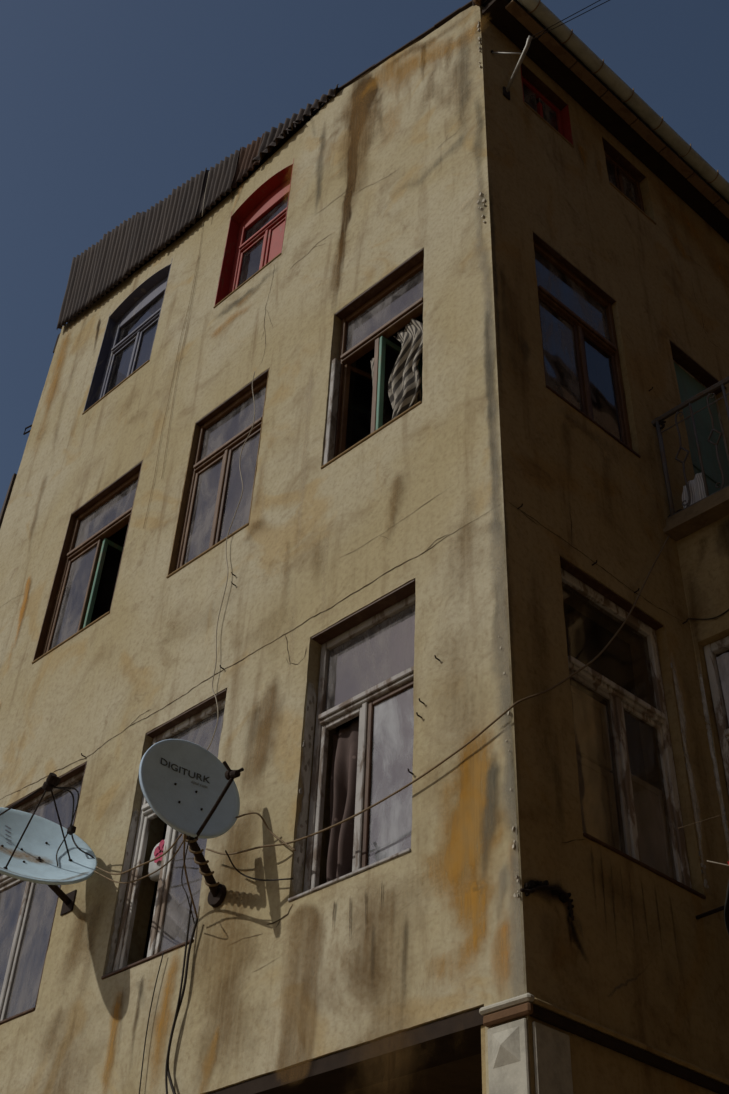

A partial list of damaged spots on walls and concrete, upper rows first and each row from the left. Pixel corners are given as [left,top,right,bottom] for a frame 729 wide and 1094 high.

leakage [333,76,378,272]
rust [435,736,489,955]